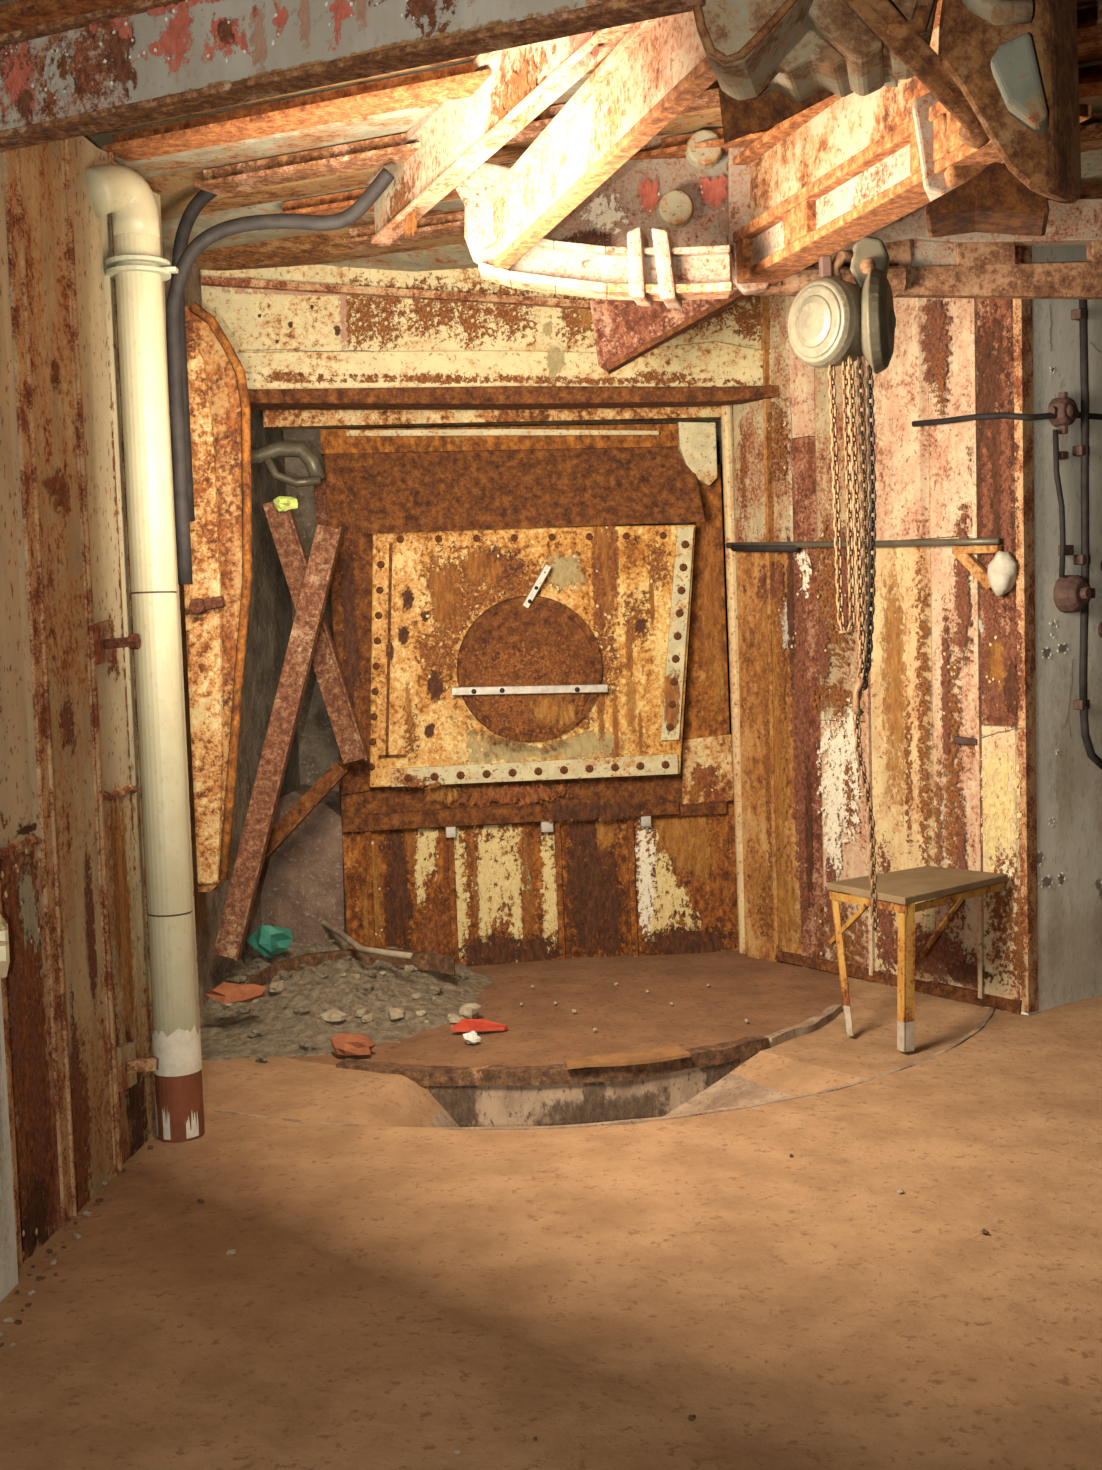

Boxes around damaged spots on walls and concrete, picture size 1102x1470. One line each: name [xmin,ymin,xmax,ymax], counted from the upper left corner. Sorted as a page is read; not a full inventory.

peeling [0,39,75,121]
peeling [95,0,289,101]
peeling [325,0,386,51]
peeling [401,0,456,40]
rust [489,44,555,143]
rust [562,229,618,247]
rust [245,272,789,494]
rust [738,418,748,519]
rust [877,298,1024,874]
rust [383,497,738,967]
rust [749,503,1031,1002]
rust [70,431,150,1213]